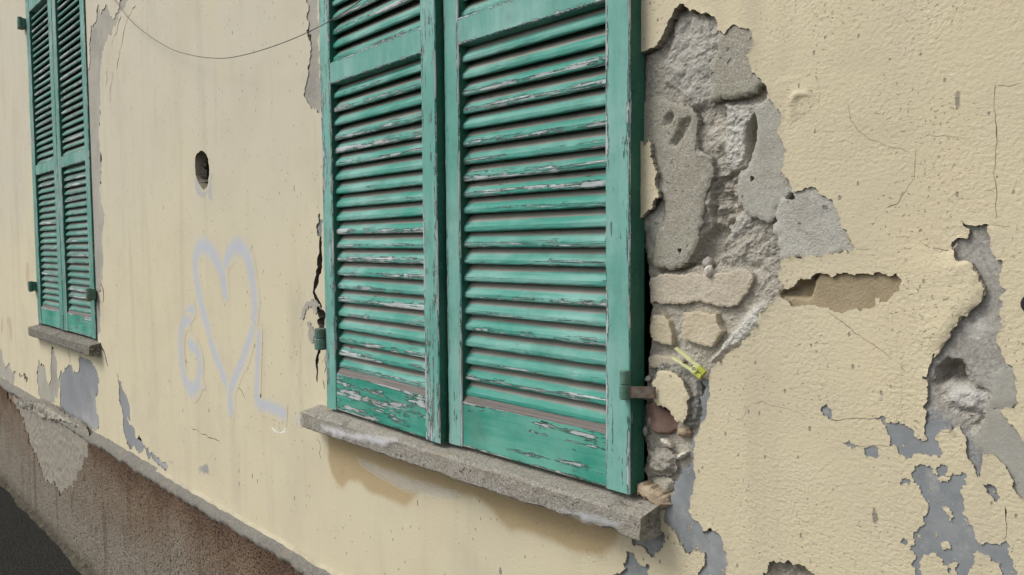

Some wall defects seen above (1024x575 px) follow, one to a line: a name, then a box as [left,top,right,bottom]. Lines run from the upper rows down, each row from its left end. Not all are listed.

crack [848,105,966,208]
crack [986,83,1019,227]
crack [313,236,326,389]
spalling [614,8,902,575]
spalling [0,349,99,495]
peeling [118,379,168,469]
spalling [845,224,1024,575]